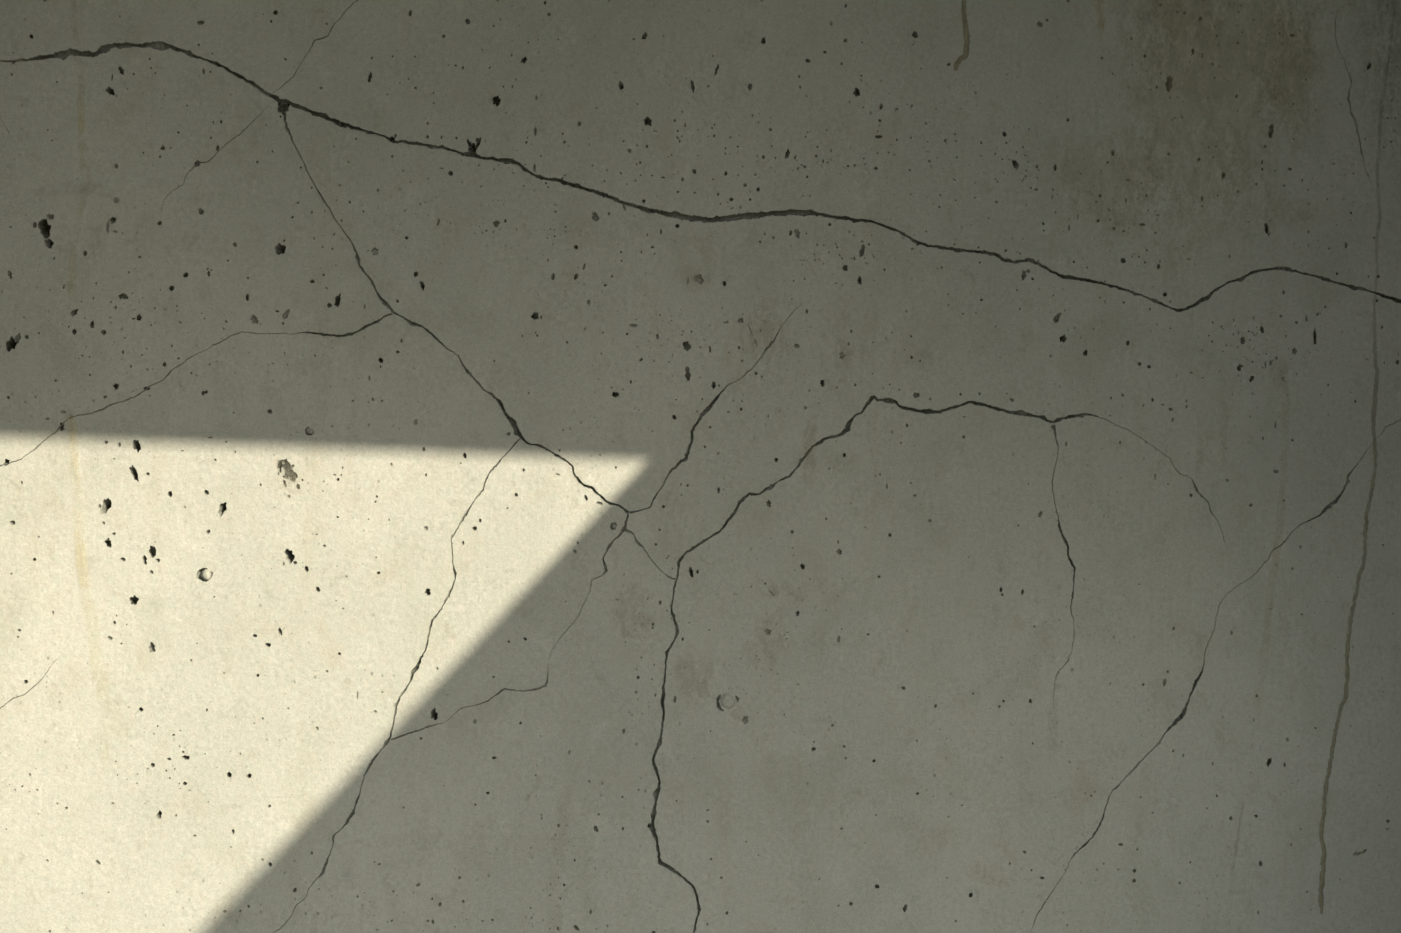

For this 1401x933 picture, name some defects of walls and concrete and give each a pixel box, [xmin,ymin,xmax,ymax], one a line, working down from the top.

crack [273,0,358,93]
crack [0,41,1401,312]
crack [0,102,1226,933]
crack [1030,419,1401,933]